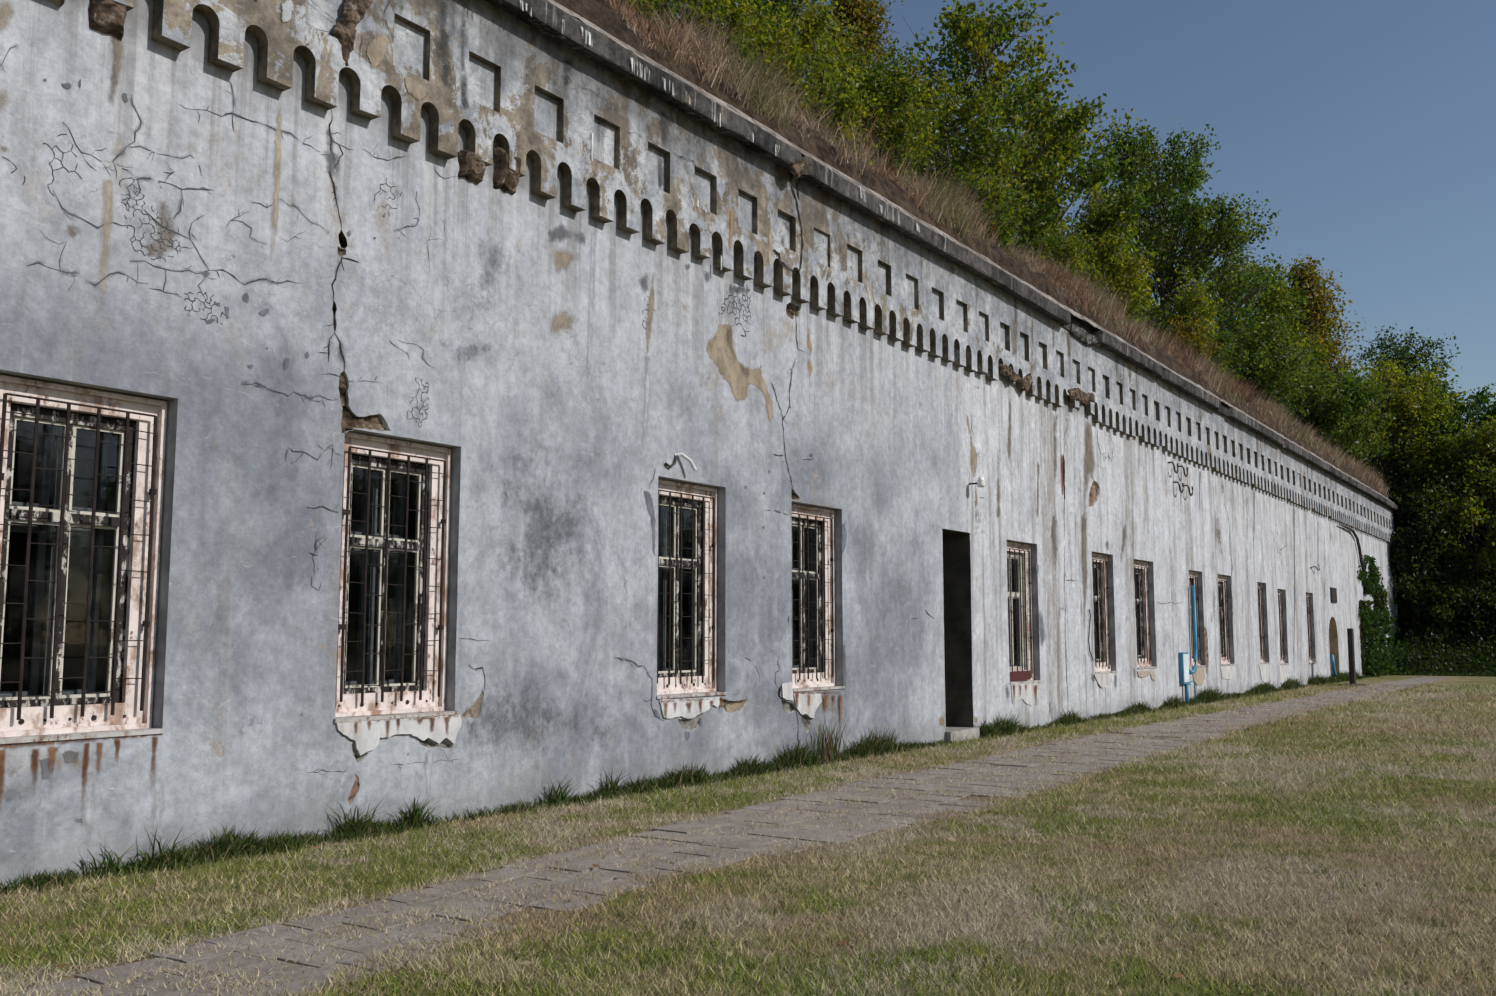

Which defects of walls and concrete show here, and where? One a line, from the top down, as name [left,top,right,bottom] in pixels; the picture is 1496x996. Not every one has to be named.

spalling [88,0,127,40]
peeling [282,0,293,22]
flaking render [334,0,389,69]
spalling [458,146,521,195]
crack [2,80,454,427]
peeling [706,324,773,421]
crack [285,444,343,469]
crack [308,505,339,591]
corrosion [0,735,157,798]
flaking render [335,691,484,805]
flaking render [654,697,748,740]
flaking render [778,682,822,732]